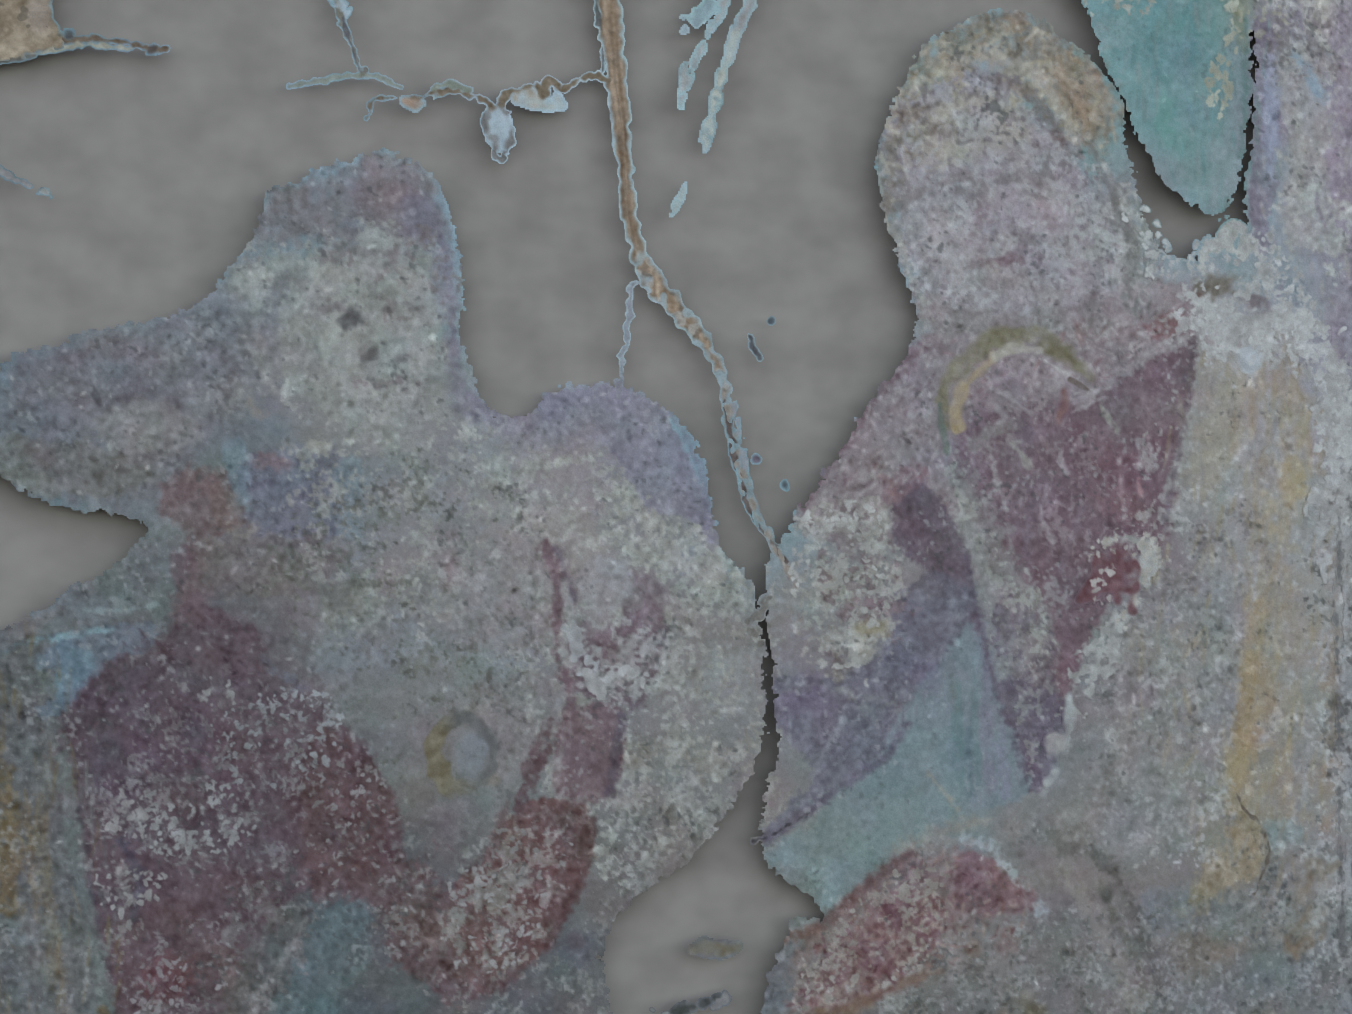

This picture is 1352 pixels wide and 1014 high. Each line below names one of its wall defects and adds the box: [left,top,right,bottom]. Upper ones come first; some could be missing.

flaking render [0,0,171,65]
peeling [1081,0,1158,19]
peeling [1202,0,1243,122]
crack [0,164,53,200]
crack [286,0,813,647]
flaking render [1041,521,1164,789]